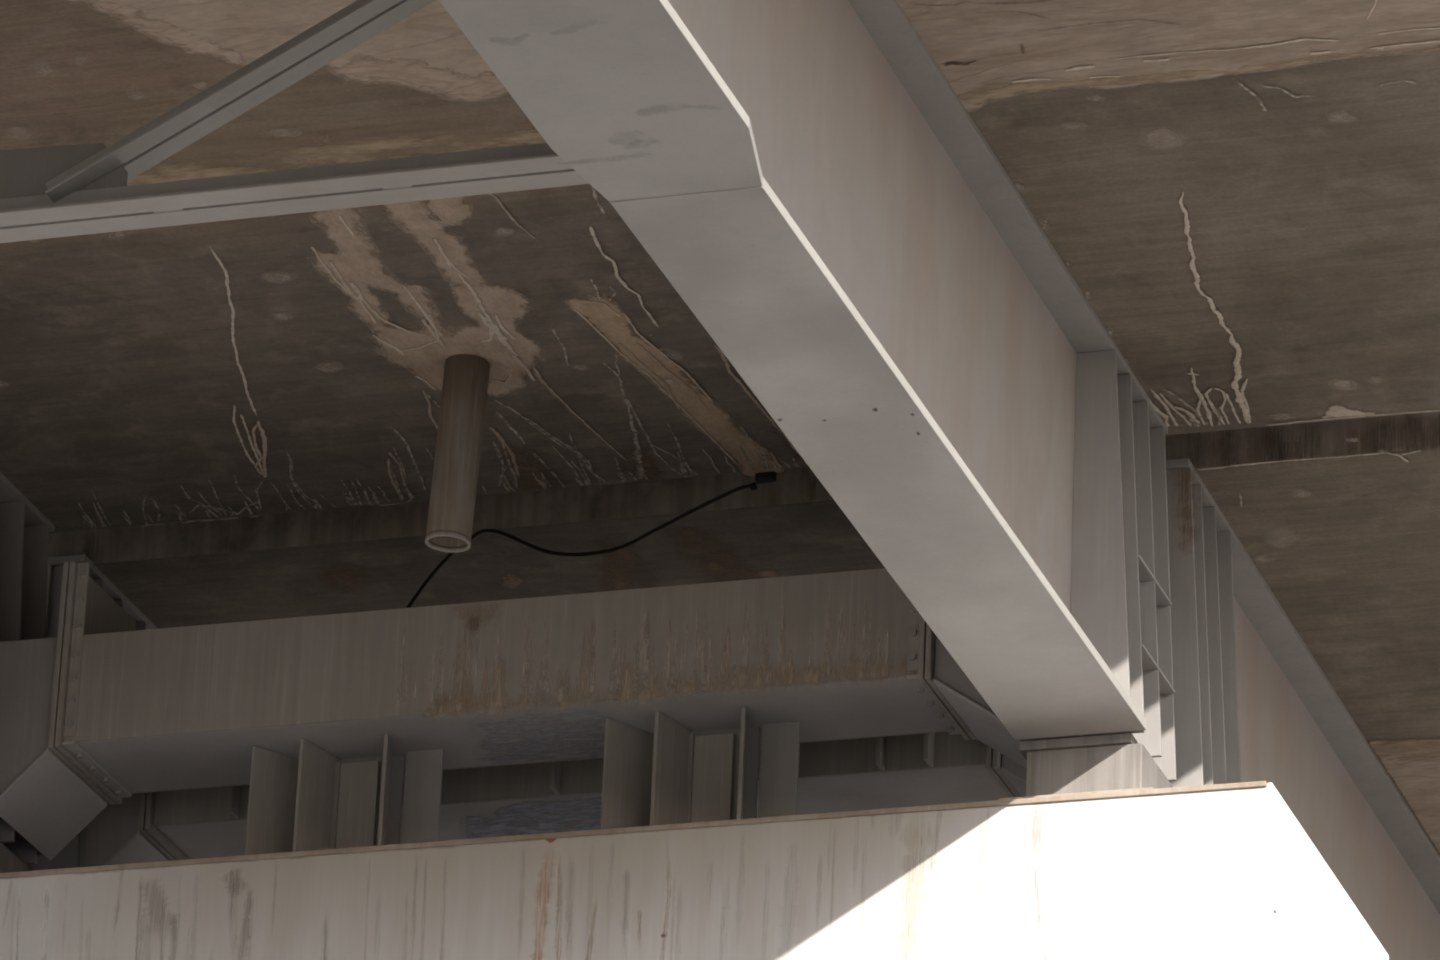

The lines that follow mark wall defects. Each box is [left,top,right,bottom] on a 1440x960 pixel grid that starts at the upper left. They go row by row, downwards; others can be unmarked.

crack [489,194,536,239]
crack [589,186,659,327]
crack [1149,191,1251,428]
crack [141,245,440,527]
crack [489,329,701,490]
crack [713,344,801,464]
crack [1198,451,1420,470]